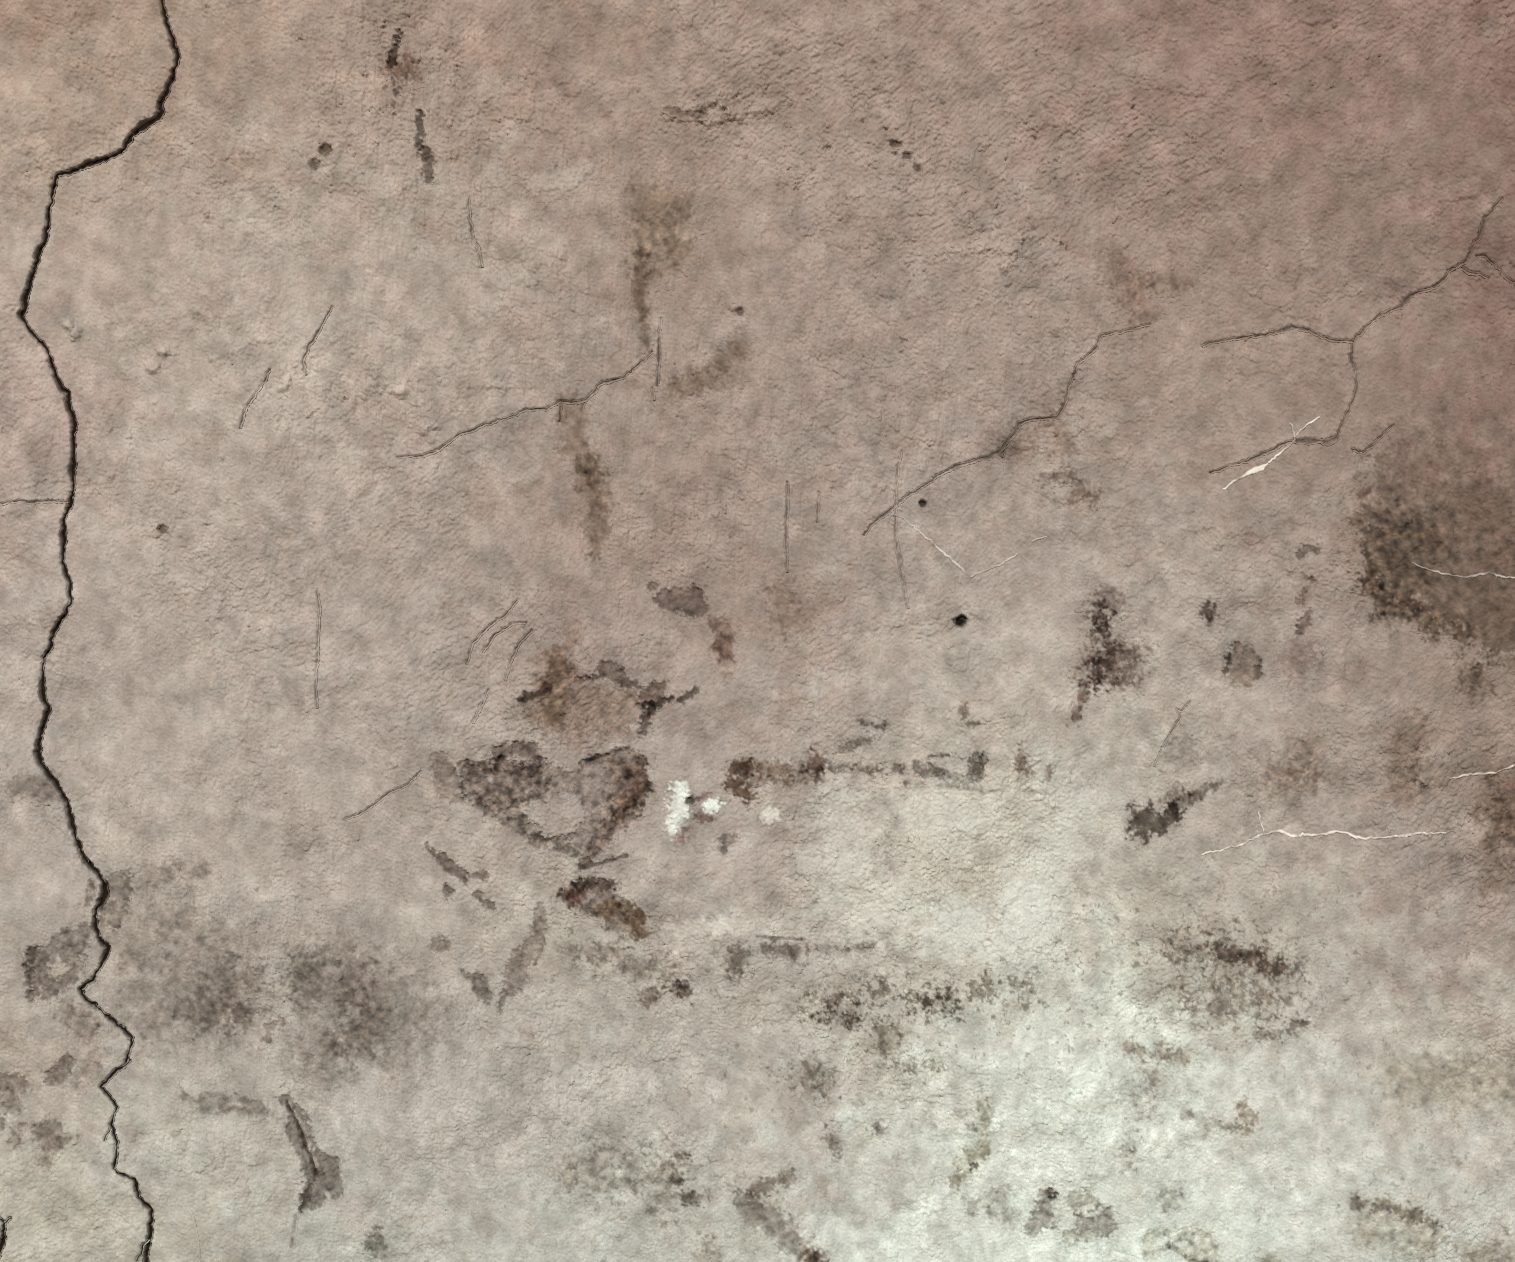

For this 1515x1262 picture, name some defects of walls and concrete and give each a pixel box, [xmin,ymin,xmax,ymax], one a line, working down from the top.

crack [397,351,652,459]
crack [863,323,1150,578]
crack [1202,196,1515,490]
crack [0,0,181,1262]
water stain [501,615,648,757]
water stain [956,697,983,730]
water stain [551,712,1121,1169]
water stain [528,1106,842,1262]
water stain [933,1091,1012,1200]